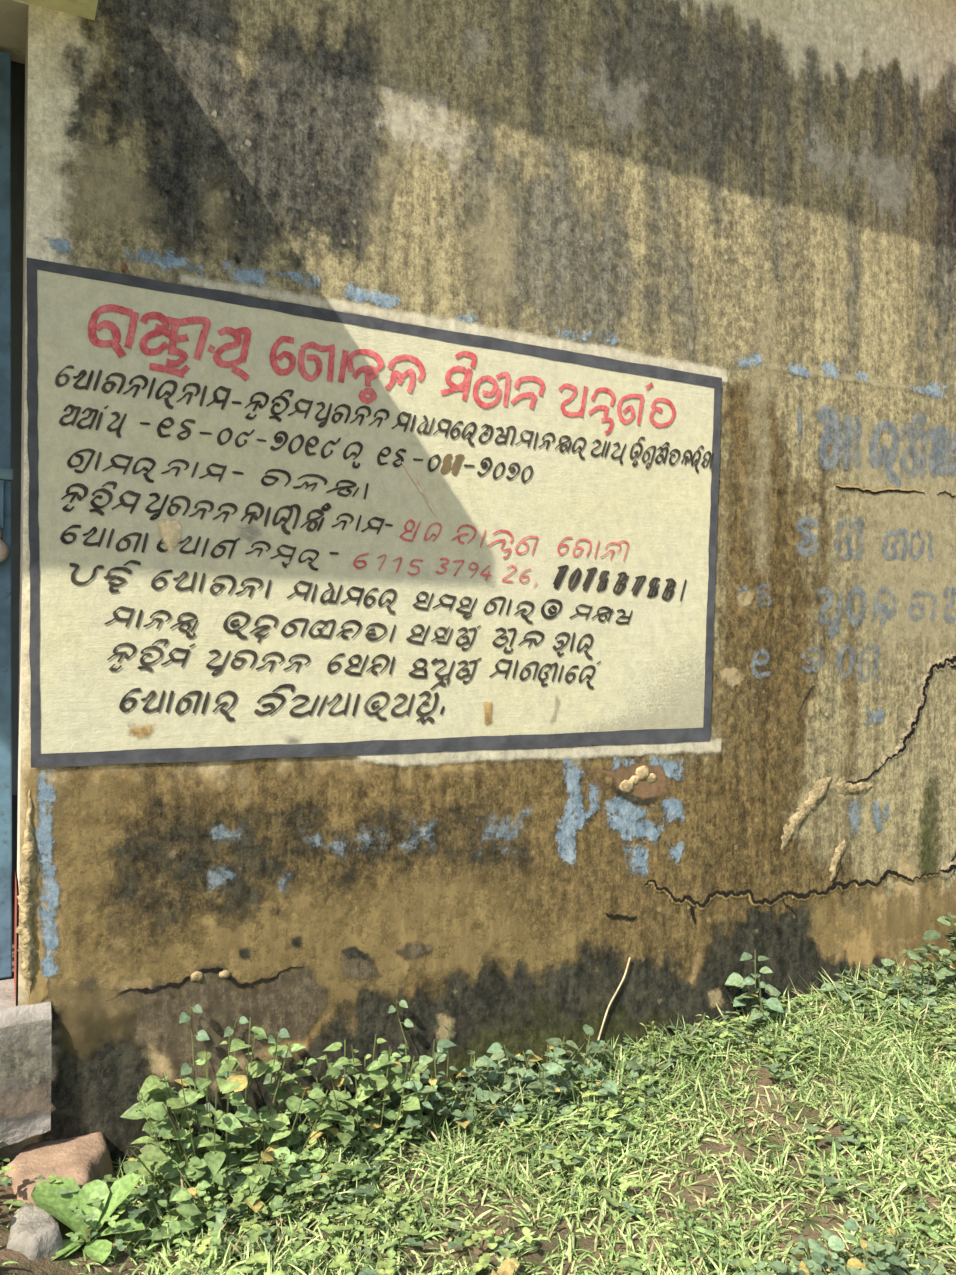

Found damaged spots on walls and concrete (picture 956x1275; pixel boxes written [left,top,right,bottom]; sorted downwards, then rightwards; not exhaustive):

damp [62,0,956,916]
crack [836,484,955,497]
crack [846,652,956,784]
peeling [556,754,685,876]
spalling [342,947,379,981]
spalling [397,943,432,959]
crack [605,913,637,921]
crack [644,852,956,924]
damp [0,894,895,1165]